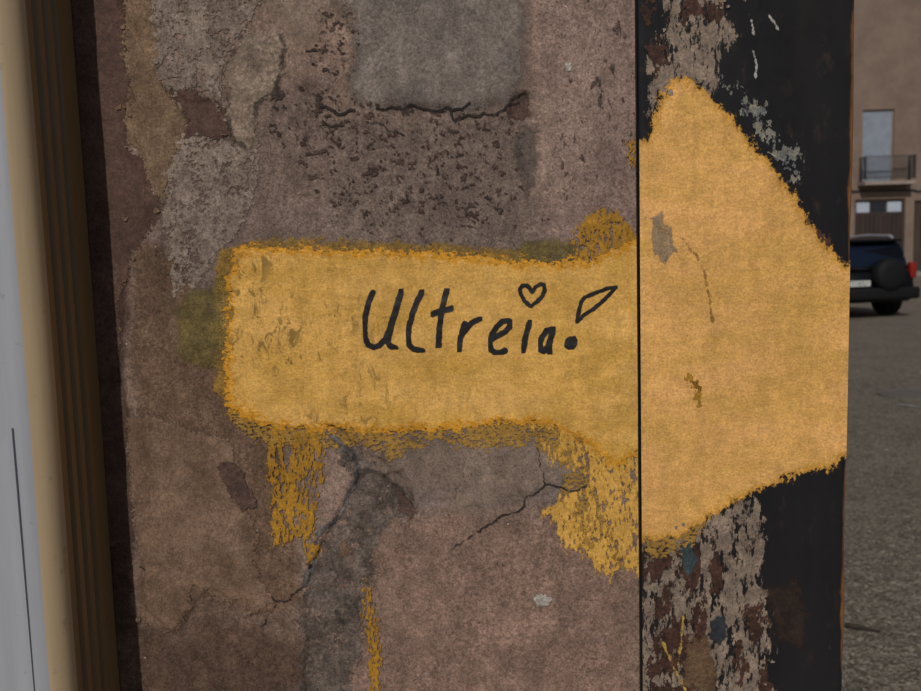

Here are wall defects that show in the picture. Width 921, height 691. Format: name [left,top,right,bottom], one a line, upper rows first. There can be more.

crack [319,102,520,136]
flaking render [587,72,633,146]
peeling [633,0,805,184]
crack [455,448,587,546]
peeling [529,423,778,691]